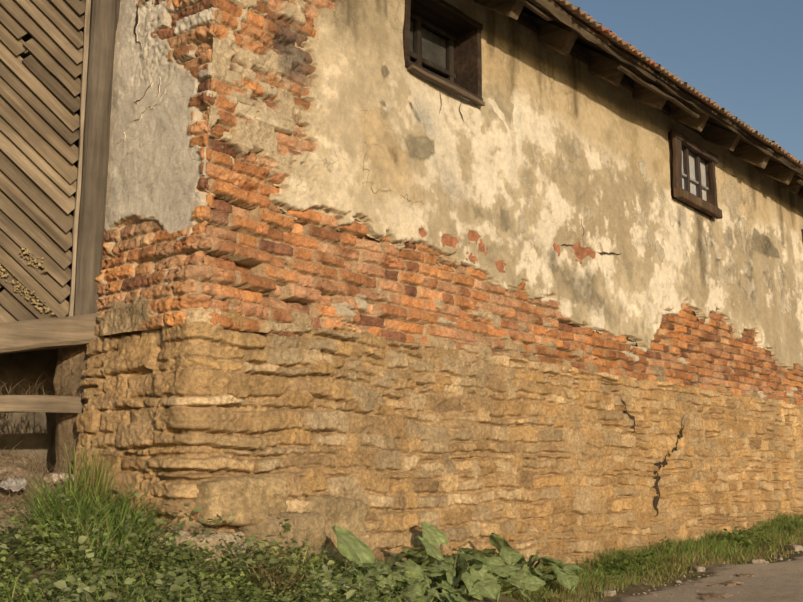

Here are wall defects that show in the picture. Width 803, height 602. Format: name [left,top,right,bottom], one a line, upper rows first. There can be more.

crack [117,77,174,144]
spalling [94,0,803,412]
crack [560,219,621,256]
crack [621,398,636,434]
crack [653,415,684,517]